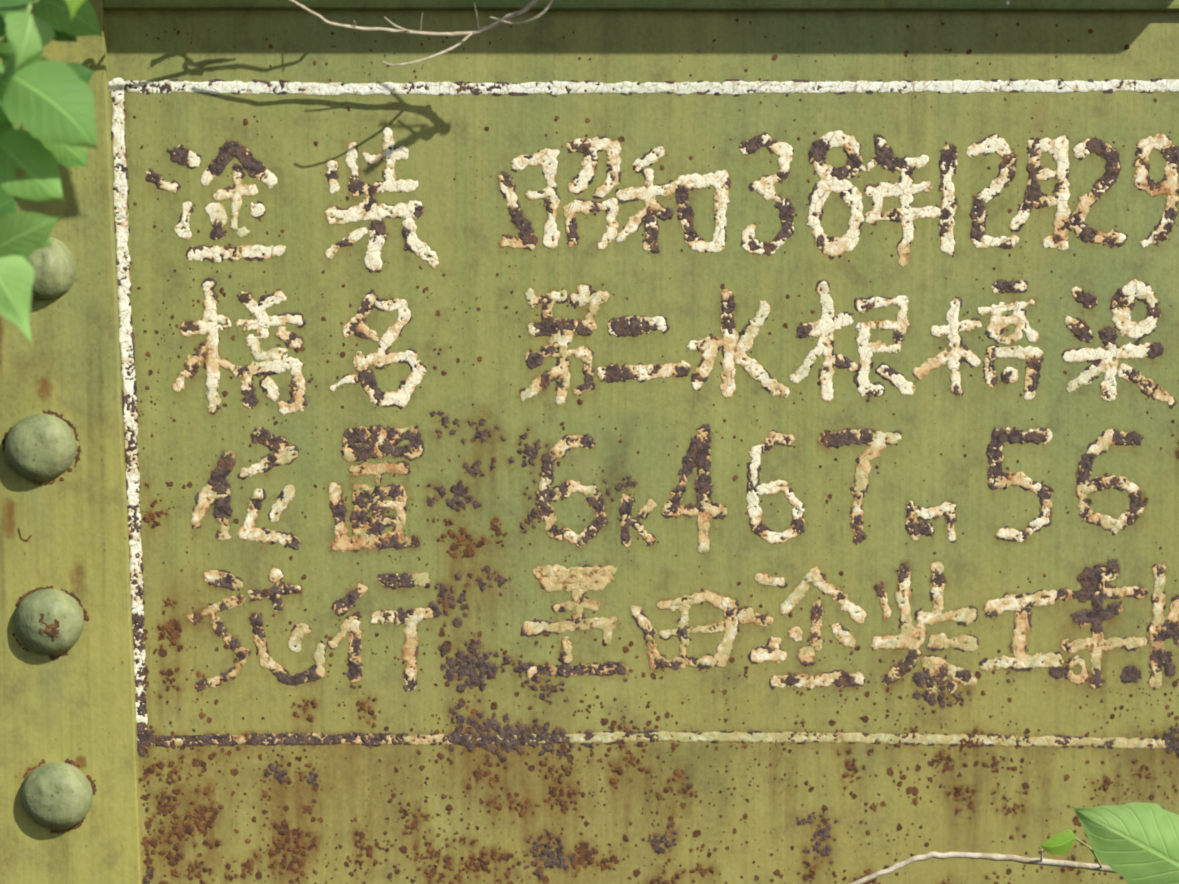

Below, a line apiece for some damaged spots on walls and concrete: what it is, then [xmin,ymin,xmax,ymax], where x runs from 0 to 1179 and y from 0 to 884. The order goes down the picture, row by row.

peeling [325,171,425,254]
corrosion [167,267,267,307]
corrosion [416,265,480,329]
peeling [116,252,142,540]
peeling [236,365,277,408]
peeling [342,289,427,409]
peeling [192,452,248,538]
peeling [251,427,299,473]
peeling [329,424,425,552]
corrosion [15,585,89,621]
corrosion [126,293,1179,884]
peeling [129,553,659,750]